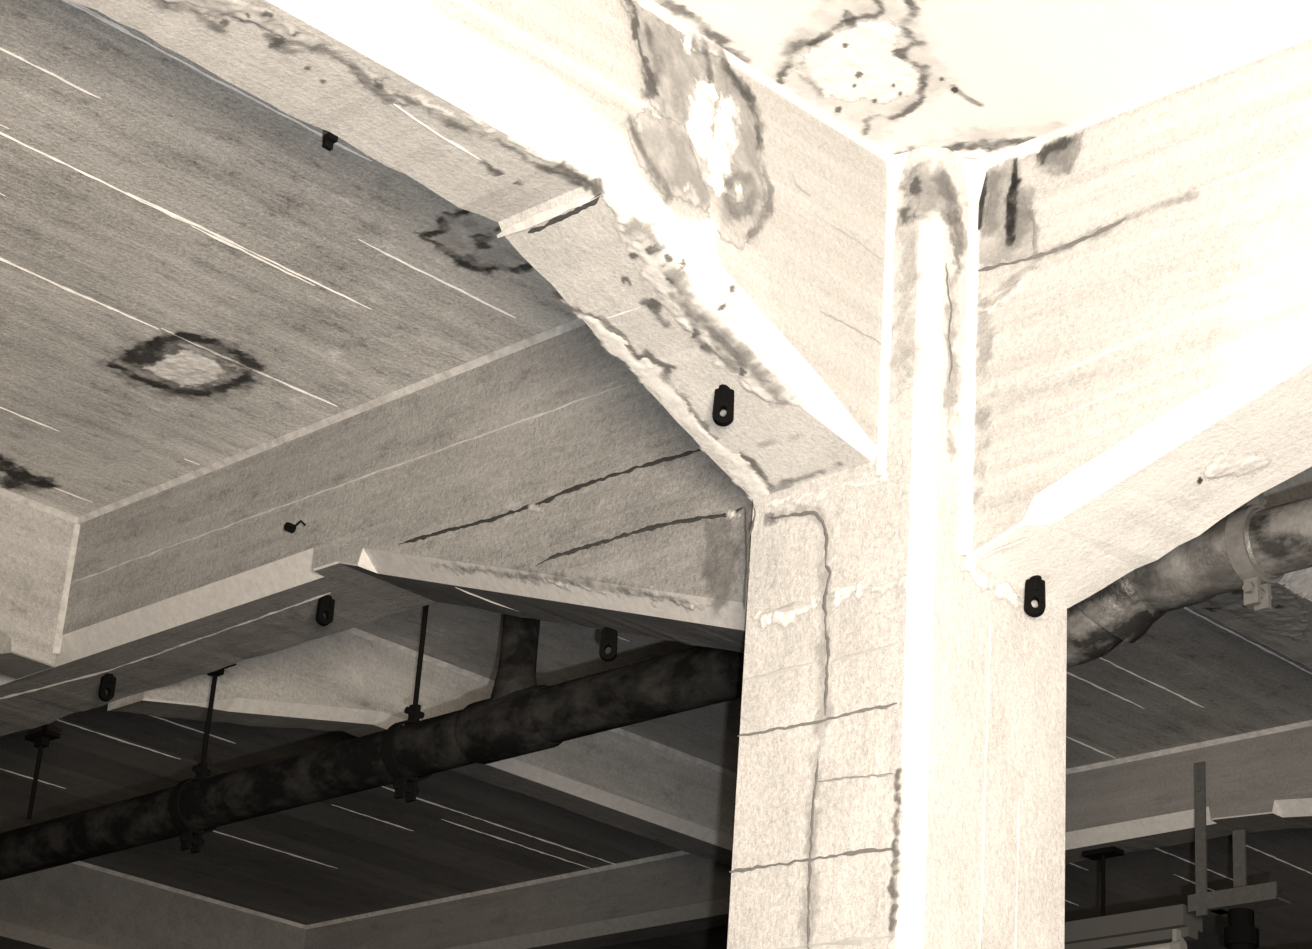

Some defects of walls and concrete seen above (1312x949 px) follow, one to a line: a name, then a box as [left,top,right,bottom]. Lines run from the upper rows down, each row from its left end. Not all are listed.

water stain [661,1,691,15]
water stain [705,31,735,55]
water stain [777,0,958,120]
water stain [419,210,533,274]
spalling [163,0,804,407]
water stain [900,168,964,273]
water stain [107,332,262,397]
peeling [556,299,772,502]
water stain [0,455,60,489]
crack [398,448,702,545]
crack [536,476,897,737]
crack [729,758,893,949]